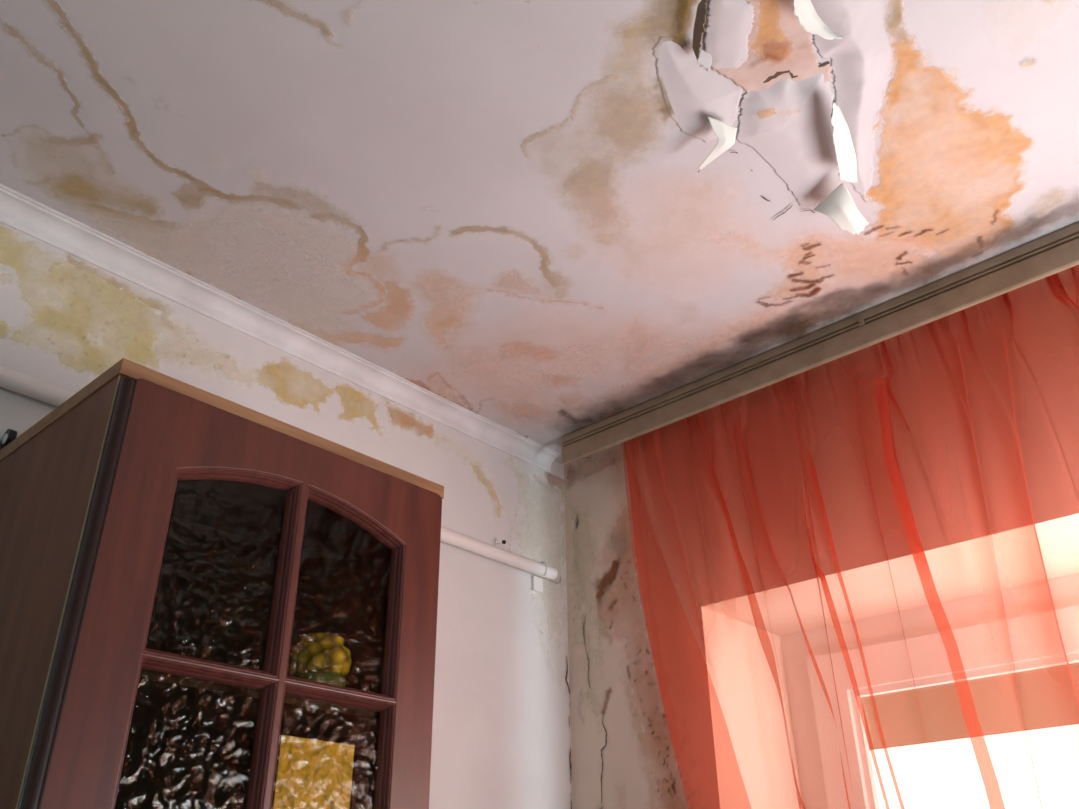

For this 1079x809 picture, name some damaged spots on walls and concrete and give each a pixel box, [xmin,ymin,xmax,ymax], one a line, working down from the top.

damp [48,0,301,209]
peeling [652,0,894,235]
damp [52,172,172,227]
damp [35,256,228,373]
damp [452,227,558,286]
damp [561,0,1056,430]
damp [260,361,381,434]
damp [389,407,434,437]
damp [598,512,636,633]
crack [565,615,591,809]
crack [600,713,608,803]
damp [629,633,690,809]